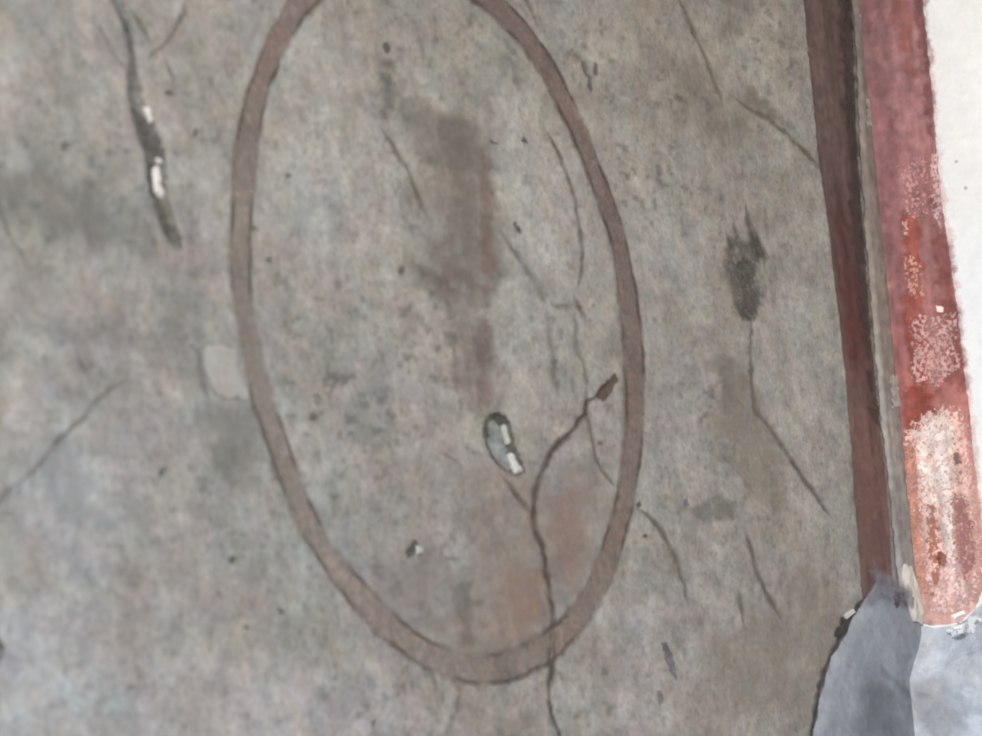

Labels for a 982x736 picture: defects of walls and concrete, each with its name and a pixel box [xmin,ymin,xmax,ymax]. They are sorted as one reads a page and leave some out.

crack [750,331,760,416]
crack [33,412,88,471]
flaking render [483,412,526,476]
crack [774,435,825,509]
crack [511,382,609,736]